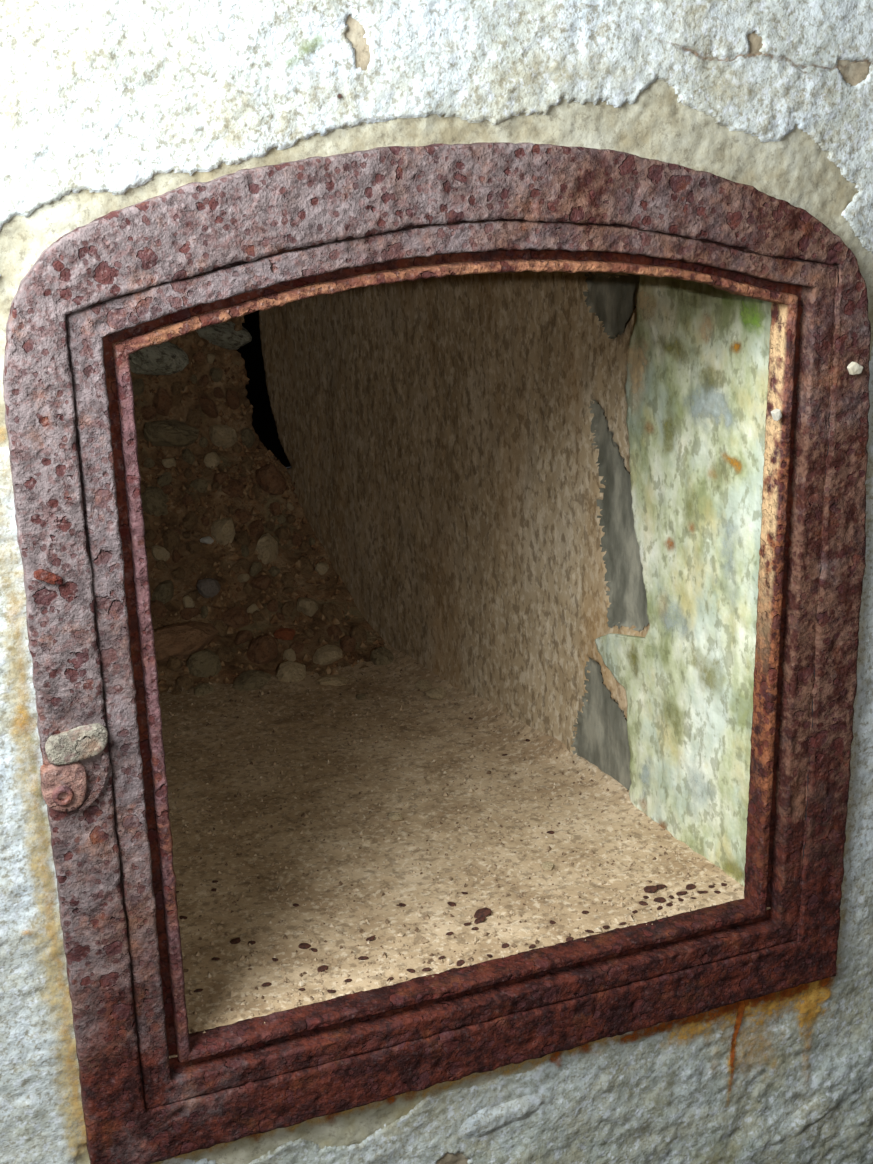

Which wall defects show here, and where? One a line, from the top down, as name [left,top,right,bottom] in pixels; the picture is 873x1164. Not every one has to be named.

crack [676,44,870,73]
corrosion [20,770,86,1156]
corrosion [292,972,837,1130]